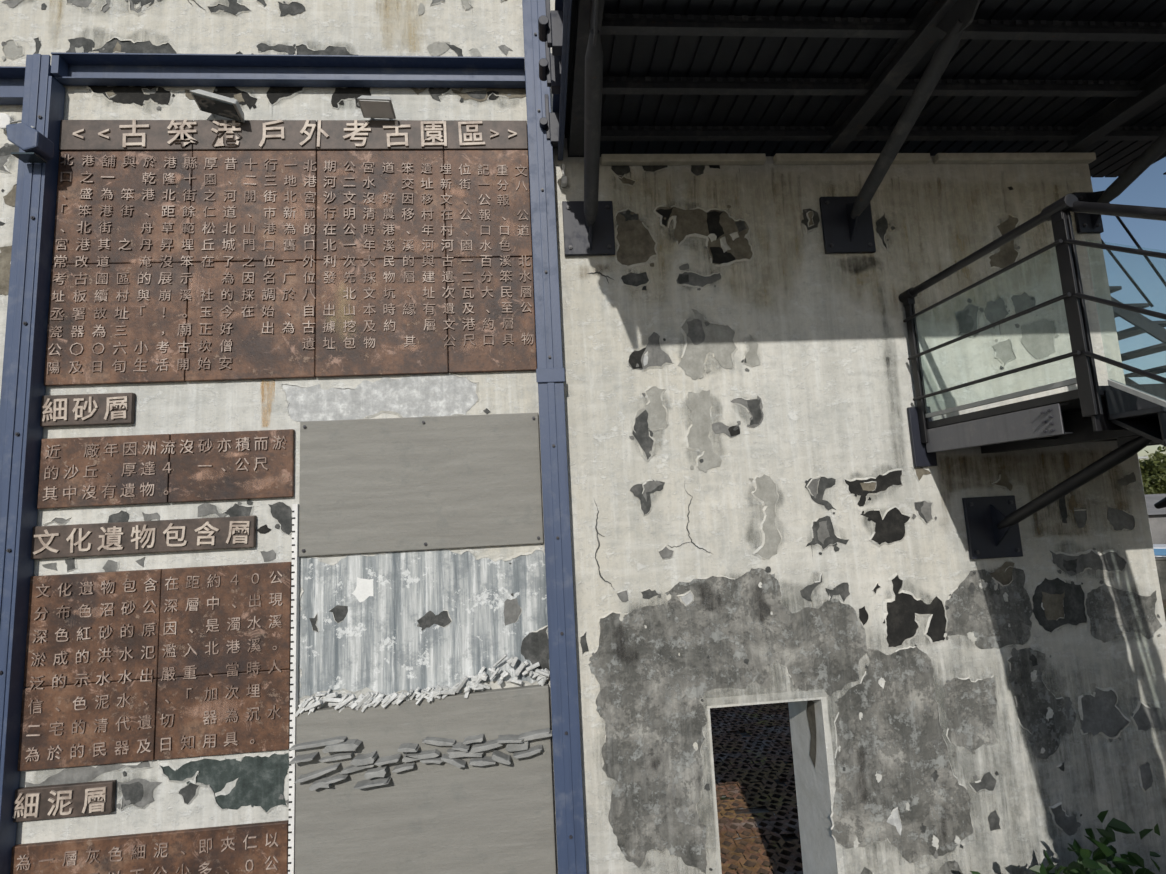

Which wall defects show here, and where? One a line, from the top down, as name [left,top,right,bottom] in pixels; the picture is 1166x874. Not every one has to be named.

peeling [66,0,160,17]
peeling [86,86,197,110]
peeling [213,86,305,109]
peeling [0,245,12,295]
peeling [615,205,754,290]
peeling [627,309,764,473]
peeling [579,467,1166,874]